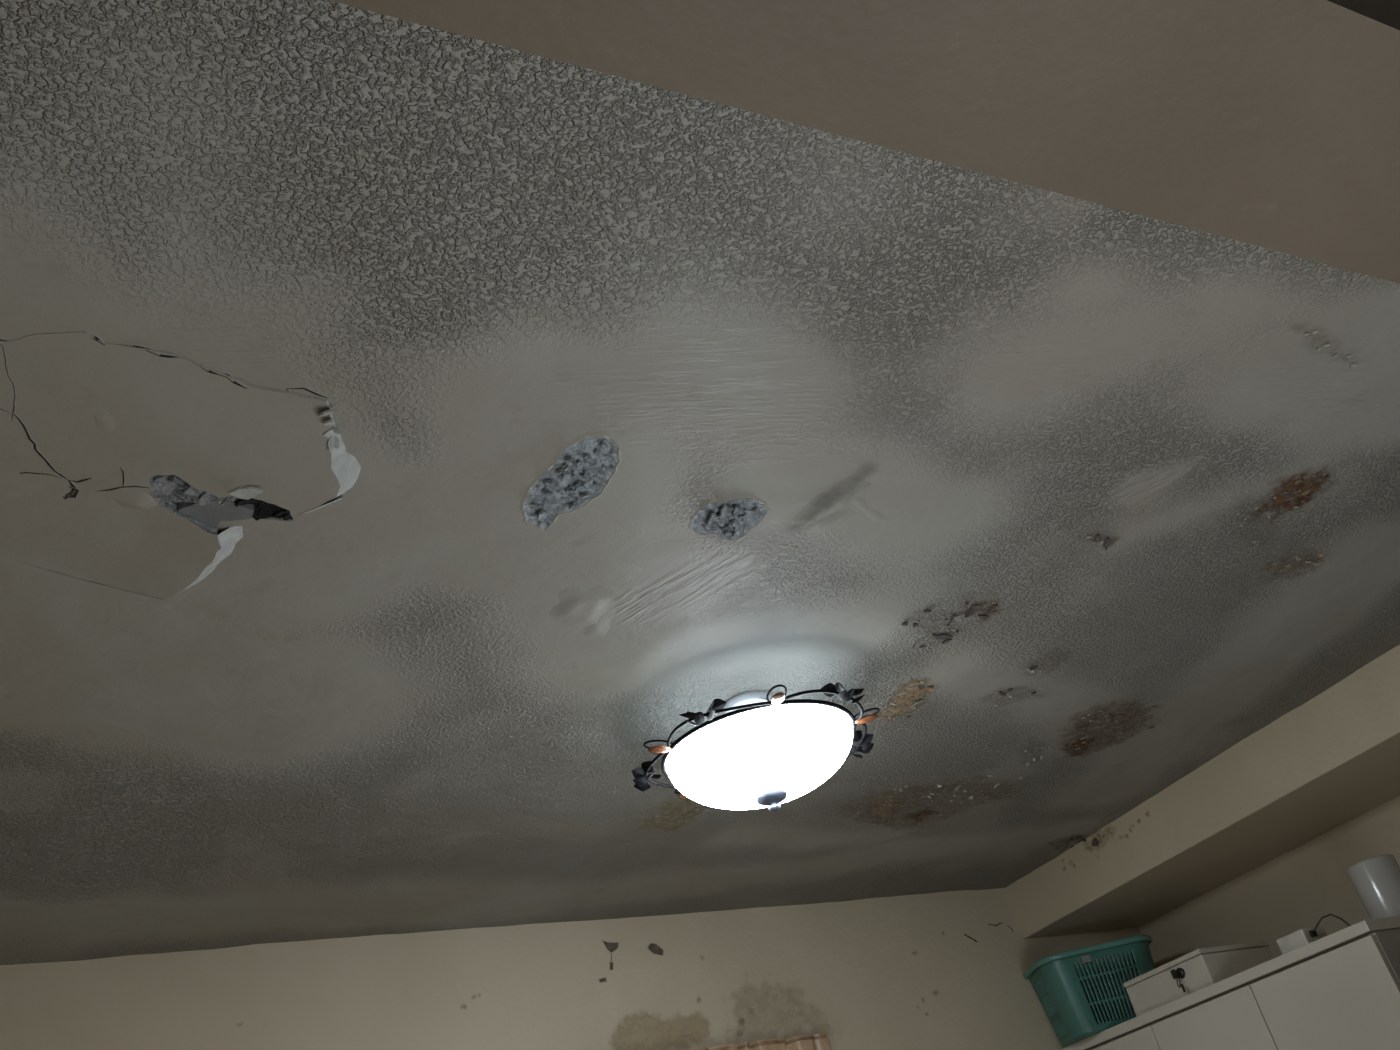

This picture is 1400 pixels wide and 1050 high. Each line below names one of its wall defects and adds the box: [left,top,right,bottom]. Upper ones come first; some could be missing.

crack [84,331,248,389]
crack [0,338,150,500]
crack [286,386,329,398]
spalling [150,475,293,534]
spalling [521,434,622,531]
spalling [688,496,770,542]
peeling [902,601,998,649]